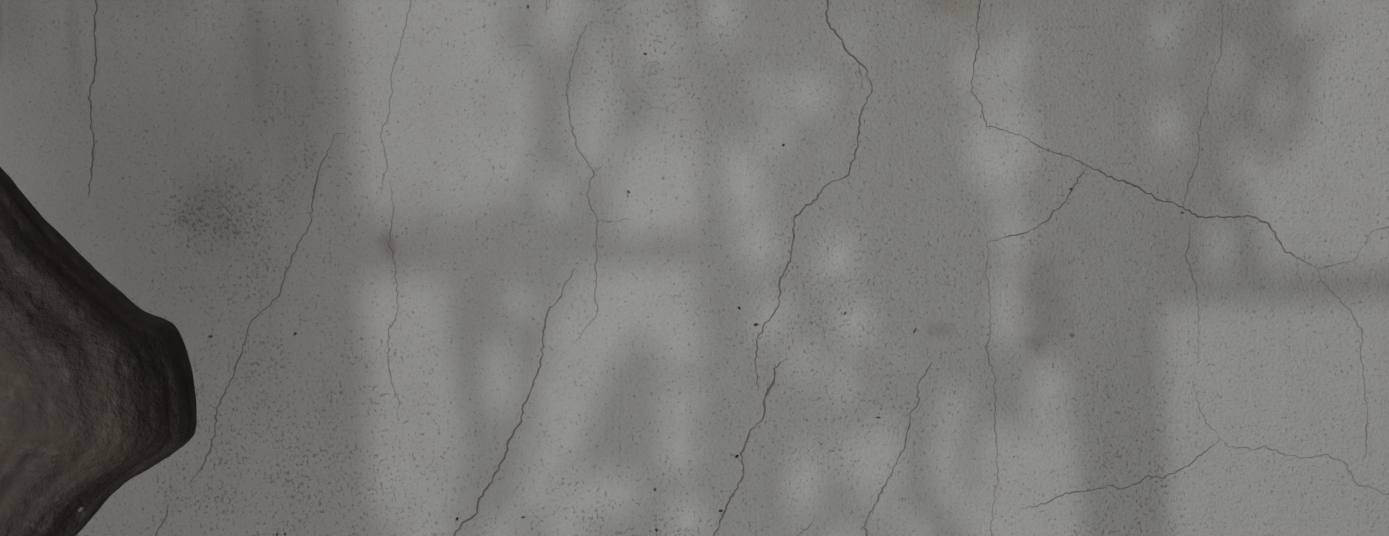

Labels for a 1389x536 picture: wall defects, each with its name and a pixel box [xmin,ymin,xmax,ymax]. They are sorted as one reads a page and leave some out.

crack [88,0,98,196]
crack [155,133,343,536]
crack [380,0,411,419]
crack [454,24,627,536]
crack [713,0,872,536]
crack [971,0,1389,536]